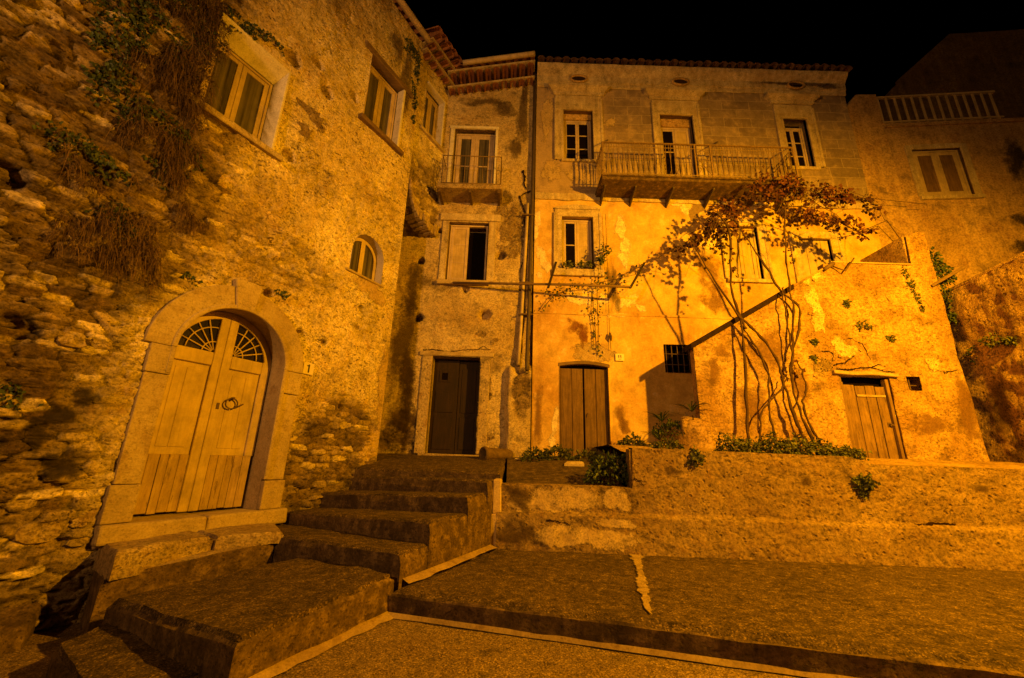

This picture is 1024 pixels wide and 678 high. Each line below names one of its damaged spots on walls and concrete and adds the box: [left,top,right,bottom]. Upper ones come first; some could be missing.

water stain [391,266,423,438]
flaking render [803,272,863,378]